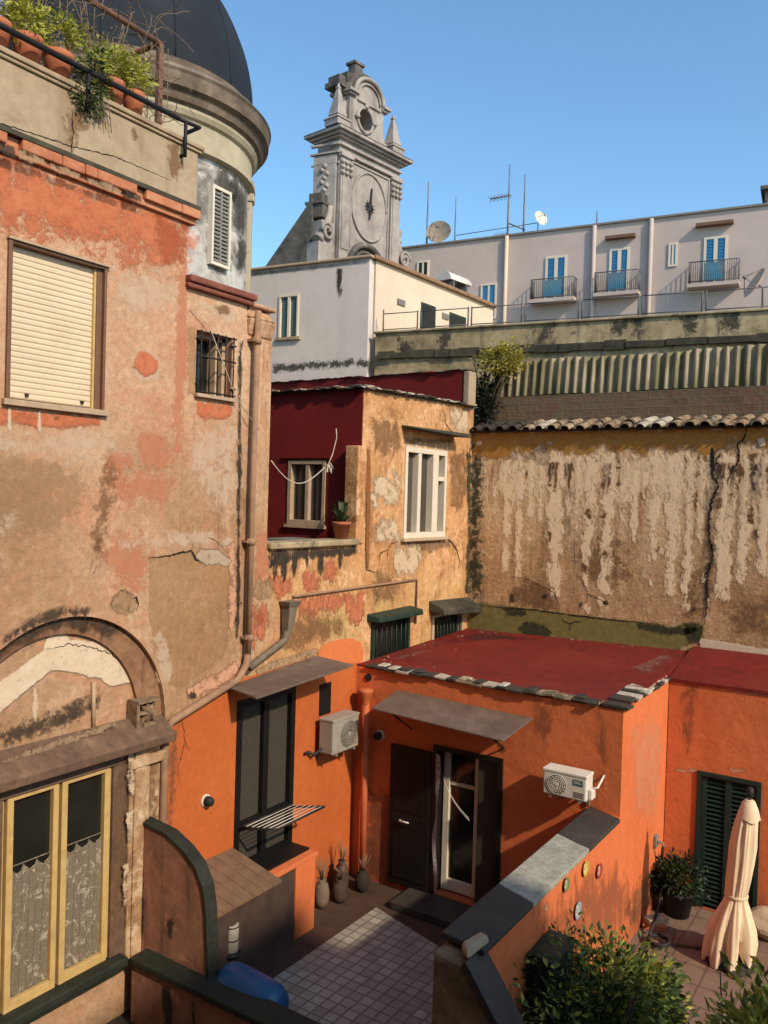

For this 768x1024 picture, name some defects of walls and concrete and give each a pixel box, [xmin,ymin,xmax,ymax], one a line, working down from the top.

water stain [215,162,249,274]
water stain [611,318,646,339]
water stain [715,310,740,333]
water stain [272,358,389,374]
peeling [370,470,425,578]
peeling [491,437,768,617]
crack [701,428,747,624]
crack [150,537,219,561]
water stain [268,545,356,581]
peeling [111,589,137,616]
peeling [0,634,130,715]
peeling [2,721,117,763]